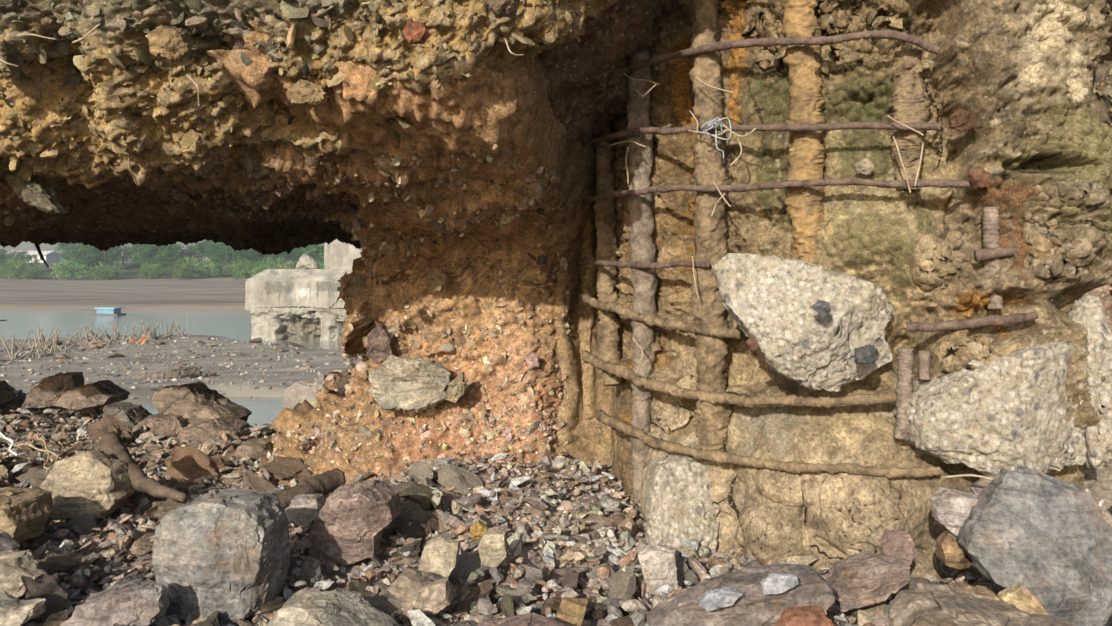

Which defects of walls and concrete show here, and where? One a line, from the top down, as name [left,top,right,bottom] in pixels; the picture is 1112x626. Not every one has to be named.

corrosion [669,42,698,140]
corrosion [721,0,757,123]
spalling [741,0,787,76]
leakage [827,74,892,177]
spalling [815,0,912,75]
leakage [1012,0,1112,256]
leakage [823,202,935,296]
spalling [941,341,1000,374]
spalling [651,374,699,438]